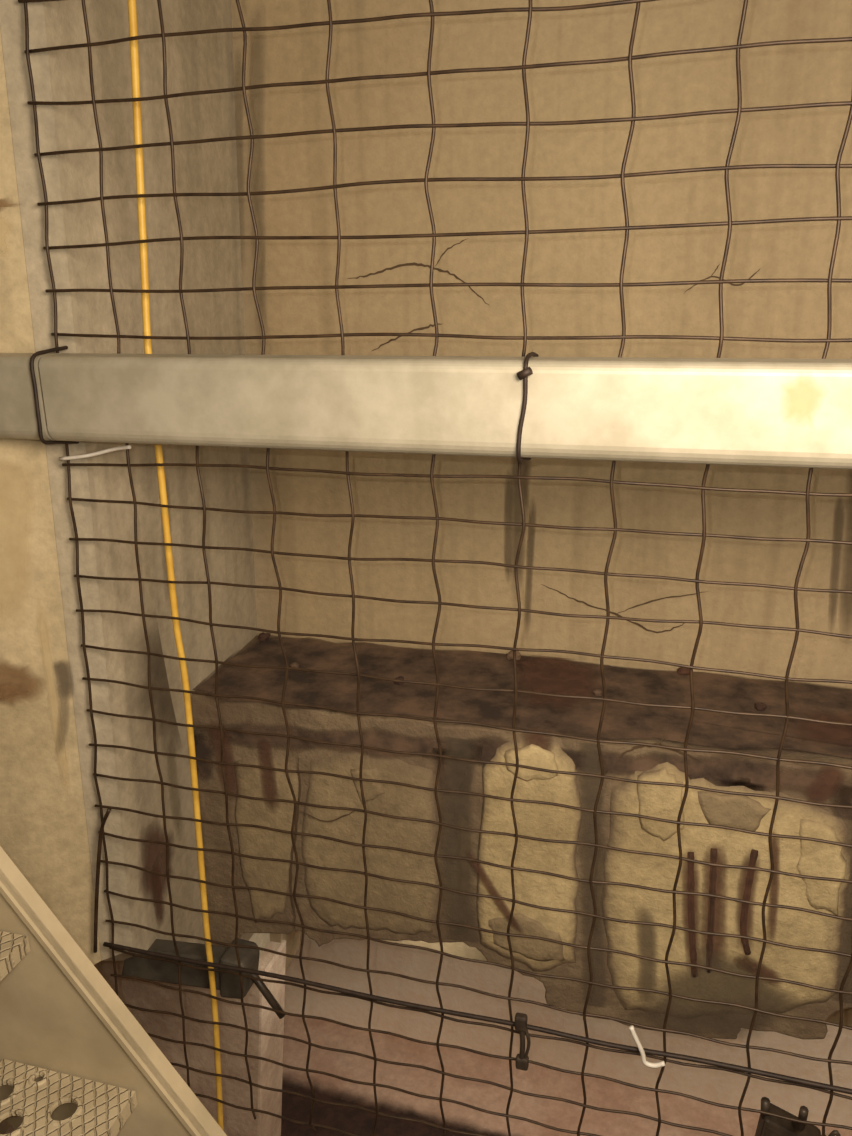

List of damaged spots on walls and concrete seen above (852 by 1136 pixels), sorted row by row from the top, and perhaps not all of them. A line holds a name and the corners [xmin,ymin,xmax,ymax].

crack [347,239,489,305]
crack [372,323,441,351]
leakage [506,457,534,618]
crack [541,584,709,633]
leakage [832,504,852,619]
rust [684,851,725,968]
rust [737,856,778,982]
rust [770,837,779,934]